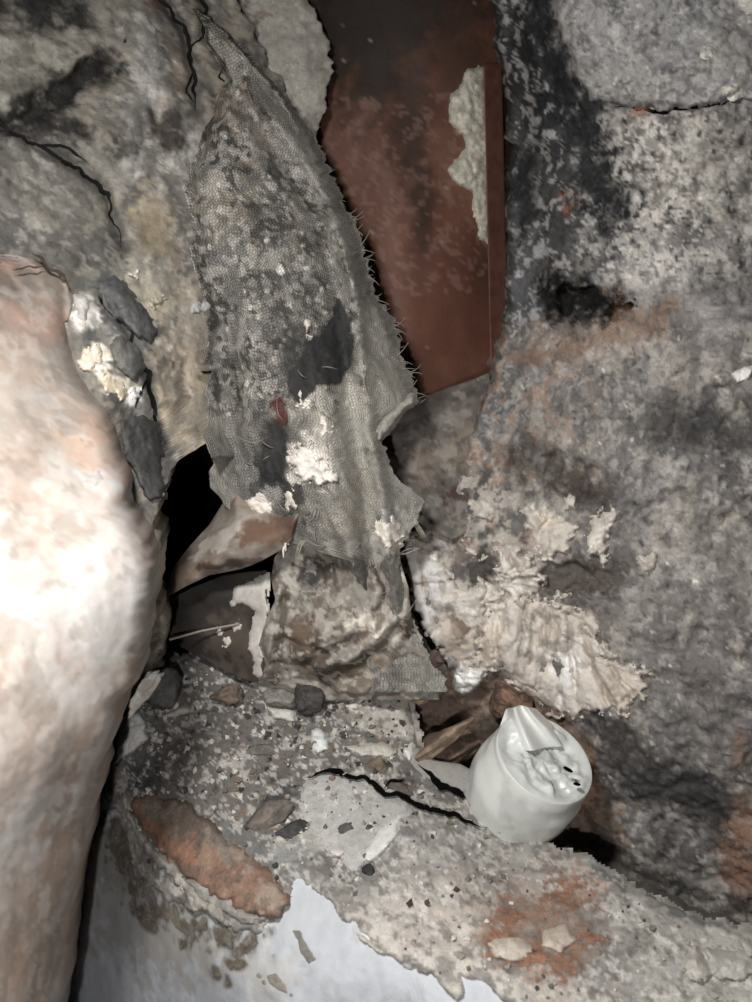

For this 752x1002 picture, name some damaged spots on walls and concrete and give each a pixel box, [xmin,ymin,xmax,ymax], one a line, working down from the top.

water stain [737,0,752,15]
crack [618,101,729,115]
water stain [721,84,743,101]
crack [0,119,121,247]
water stain [506,147,539,246]
water stain [597,183,631,240]
flaking render [245,492,272,513]
flaking render [284,412,339,511]
flaking render [374,492,658,721]
crack [306,764,488,828]
flaking render [100,572,752,1002]
rust [481,871,604,985]